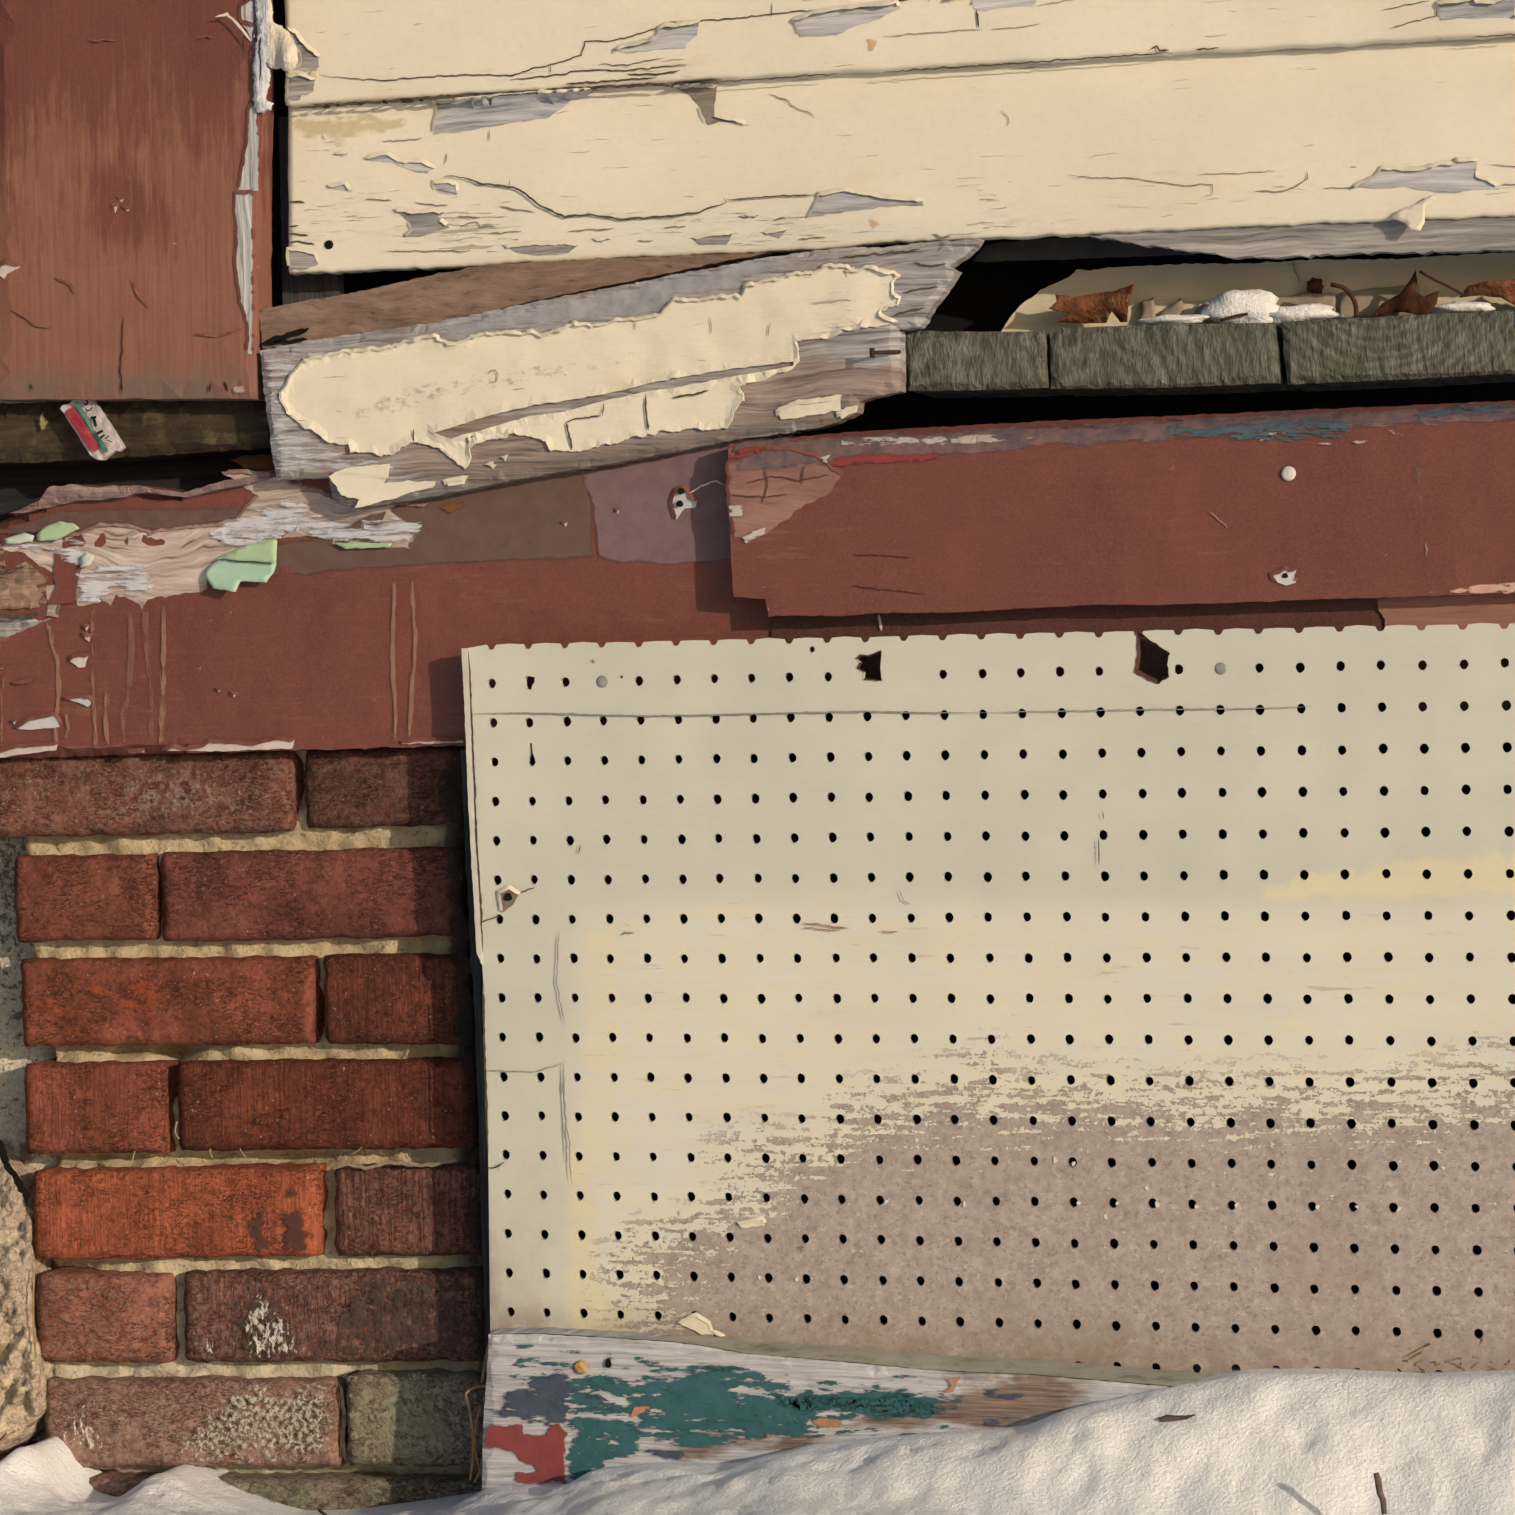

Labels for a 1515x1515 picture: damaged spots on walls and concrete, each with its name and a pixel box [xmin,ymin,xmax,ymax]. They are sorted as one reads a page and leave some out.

peeling [285,27,320,101]
crack [322,6,842,84]
crack [896,0,1067,36]
crack [1384,0,1440,28]
peeling [232,100,262,354]
crack [1068,170,1354,196]
peeling [1351,157,1500,231]
peeling [725,435,1002,543]
peeling [205,539,277,592]
peeling [0,694,93,758]
peeling [127,735,296,753]
peeling [485,1338,962,1484]